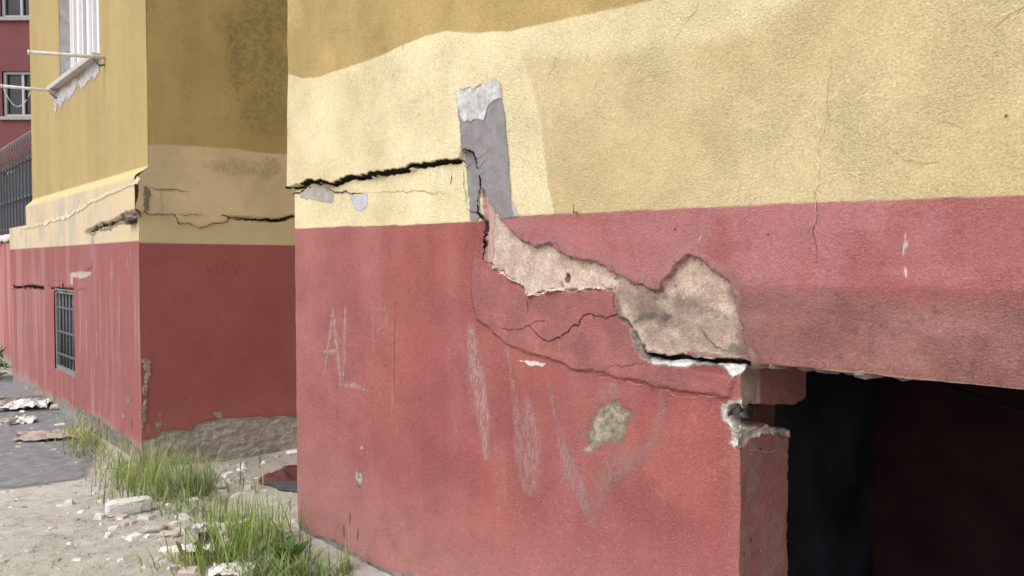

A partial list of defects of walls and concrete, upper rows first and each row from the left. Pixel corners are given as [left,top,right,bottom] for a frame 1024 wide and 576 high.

peeling [300,184,334,203]
peeling [350,194,368,211]
crack [812,60,836,261]
peeling [70,271,92,286]
crack [12,149,751,399]
flaking render [482,194,913,381]
flaking render [140,358,297,467]
peeling [585,385,632,451]
flaking render [721,398,790,448]